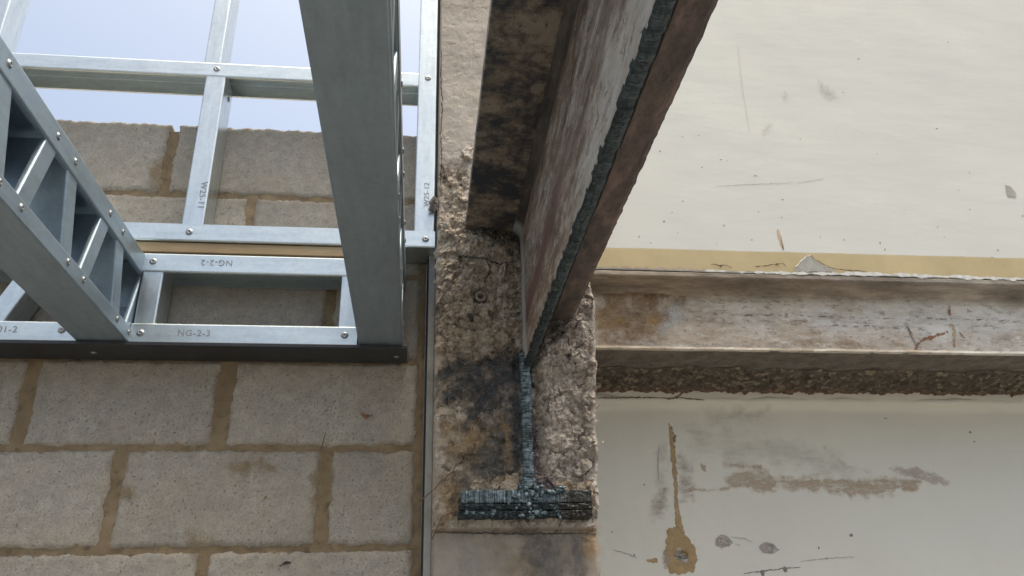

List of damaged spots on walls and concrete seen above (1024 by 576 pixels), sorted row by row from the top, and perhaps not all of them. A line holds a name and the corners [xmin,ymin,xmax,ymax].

peeling [738,255,1024,281]
corrosion [915,306,965,350]
spalling [536,301,604,507]
spalling [470,471,520,490]
leakage [720,465,946,497]